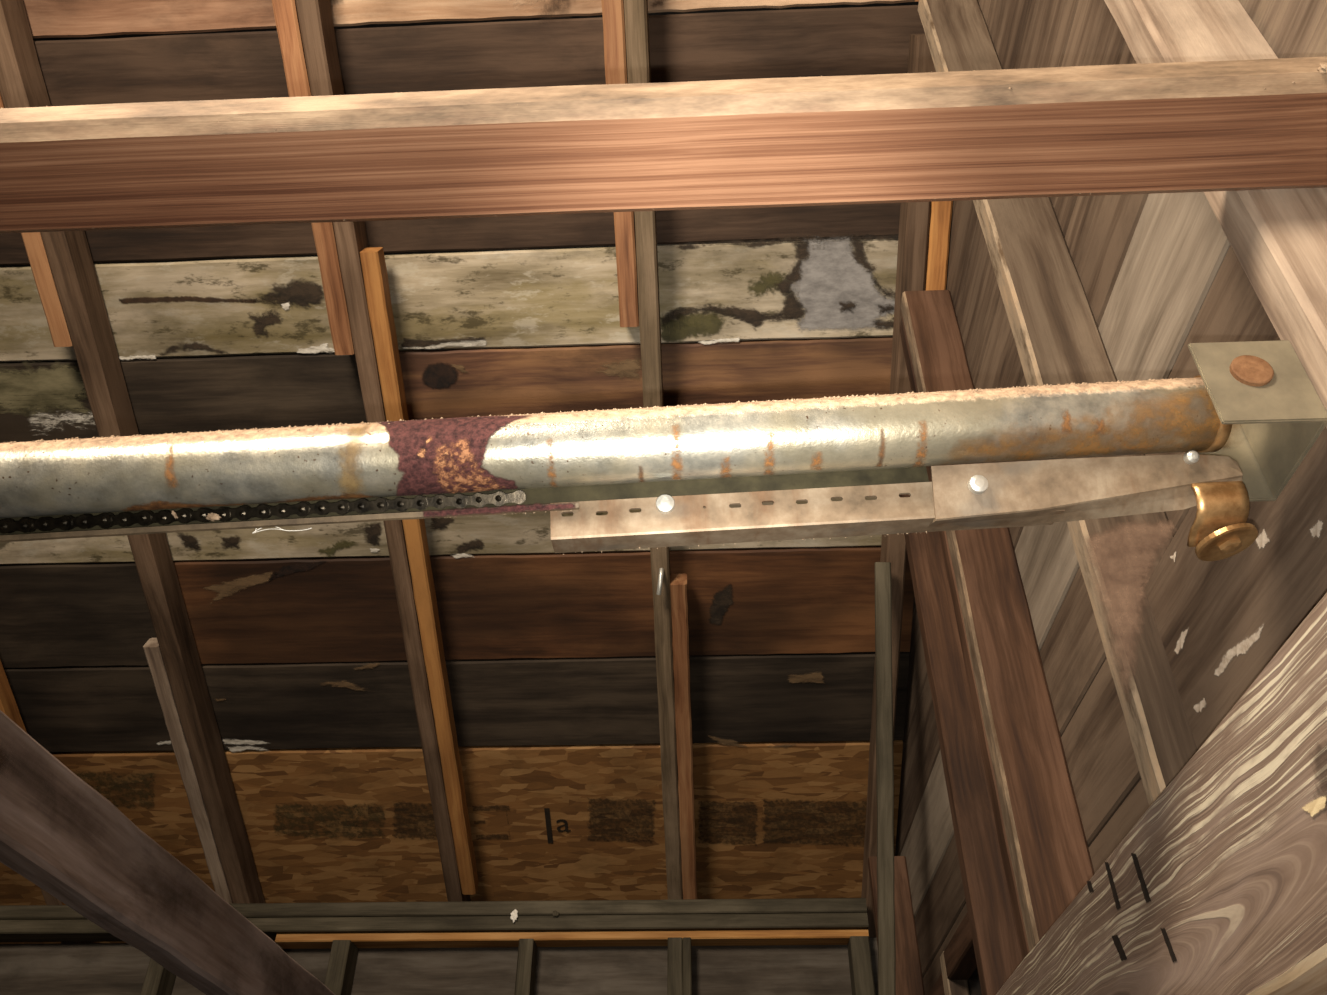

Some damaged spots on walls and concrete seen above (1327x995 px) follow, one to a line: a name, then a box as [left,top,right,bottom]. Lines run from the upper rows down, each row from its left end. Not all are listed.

leakage [249,281,324,337]
leakage [661,234,899,342]
leakage [160,342,223,355]
corrosion [287,416,575,517]
corrosion [672,427,682,479]
corrosion [967,392,1220,460]
corrosion [124,501,243,511]